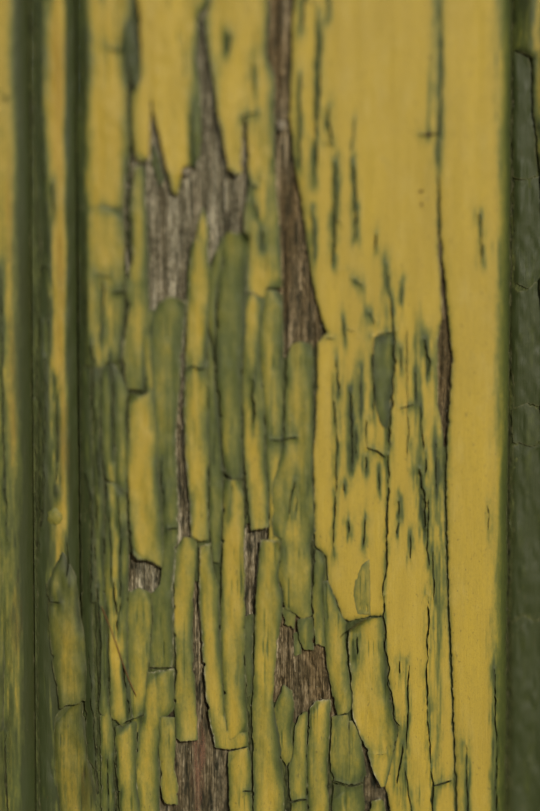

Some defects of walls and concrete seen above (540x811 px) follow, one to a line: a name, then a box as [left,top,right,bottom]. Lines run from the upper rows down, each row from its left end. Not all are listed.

crack [298,0,377,259]
crack [419,7,442,150]
crack [508,51,516,306]
peeling [39,0,399,811]
crack [223,355,256,529]
crack [271,273,468,811]
crack [487,414,512,811]
crack [243,708,254,811]